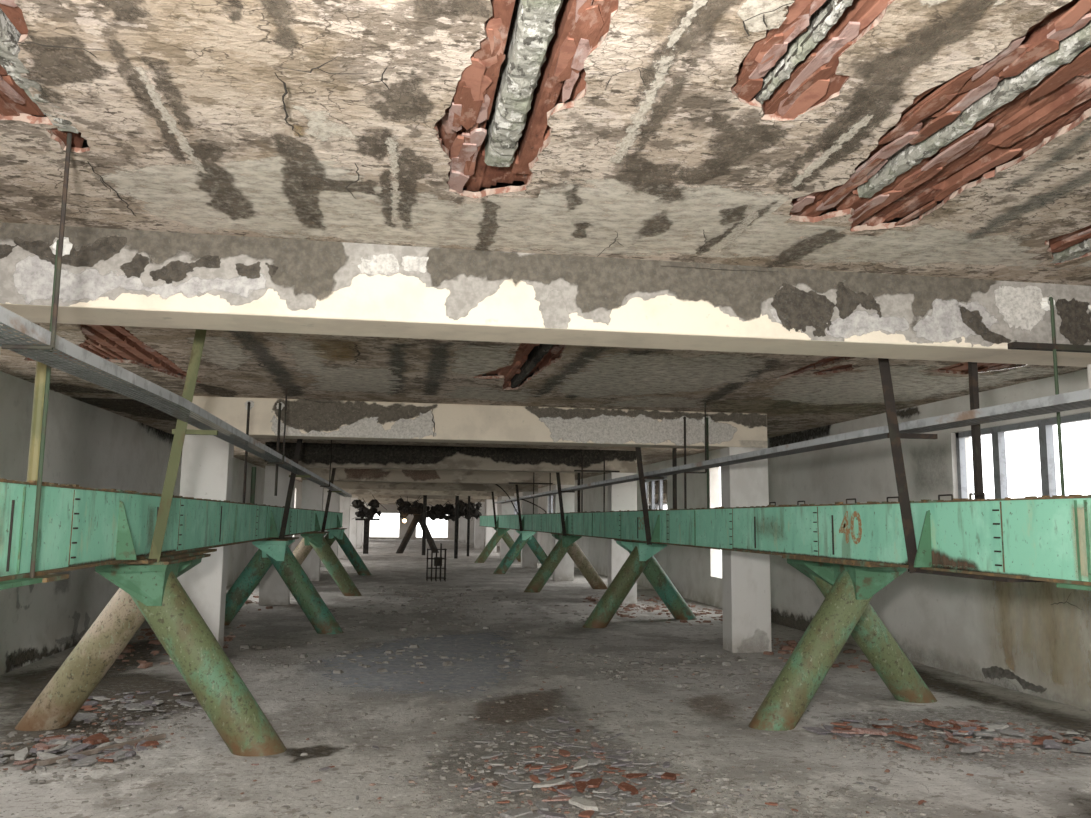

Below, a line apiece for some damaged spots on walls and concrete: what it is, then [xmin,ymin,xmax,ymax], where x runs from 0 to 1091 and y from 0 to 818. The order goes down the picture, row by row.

spalling [0,0,90,153]
crack [272,56,396,137]
spalling [434,0,619,198]
spalling [731,0,894,121]
spalling [789,0,1091,232]
leakage [0,0,1091,345]
peeling [0,239,317,311]
peeling [332,242,509,320]
peeling [522,278,678,329]
peeling [953,280,1091,347]
spalling [472,343,566,390]
peeling [272,399,438,433]